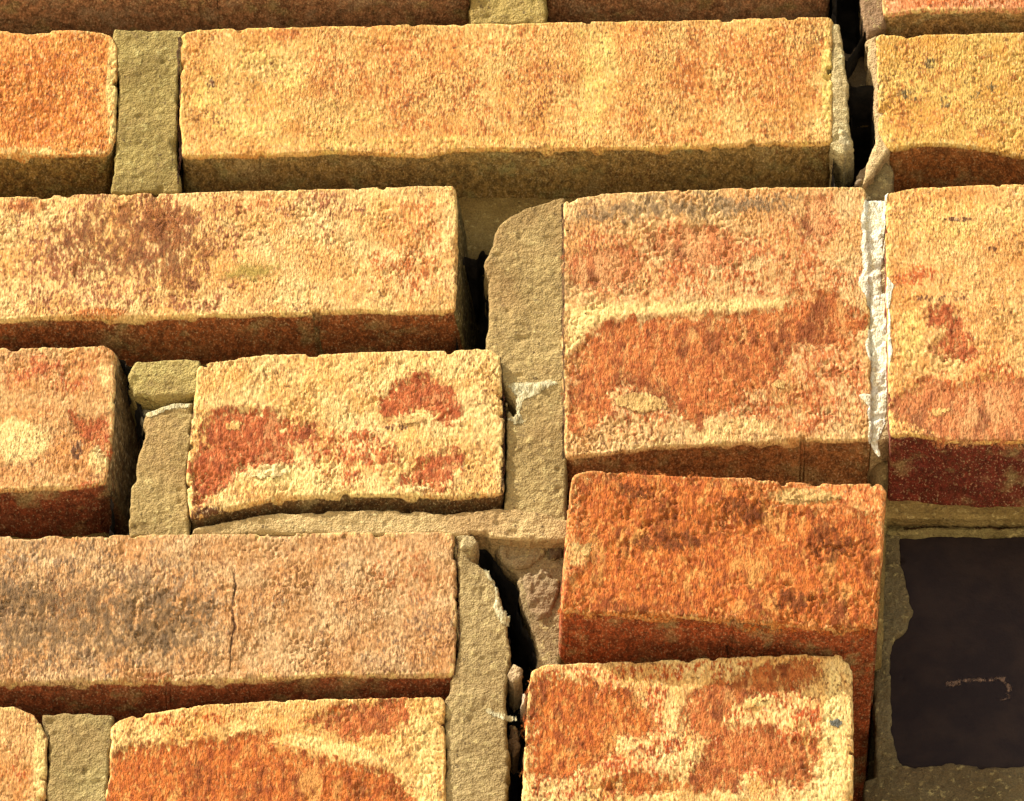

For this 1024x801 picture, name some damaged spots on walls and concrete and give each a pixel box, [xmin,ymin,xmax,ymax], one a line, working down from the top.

crack [829,0,875,187]
crack [456,251,508,496]
damp [859,193,894,457]
crack [454,539,537,801]